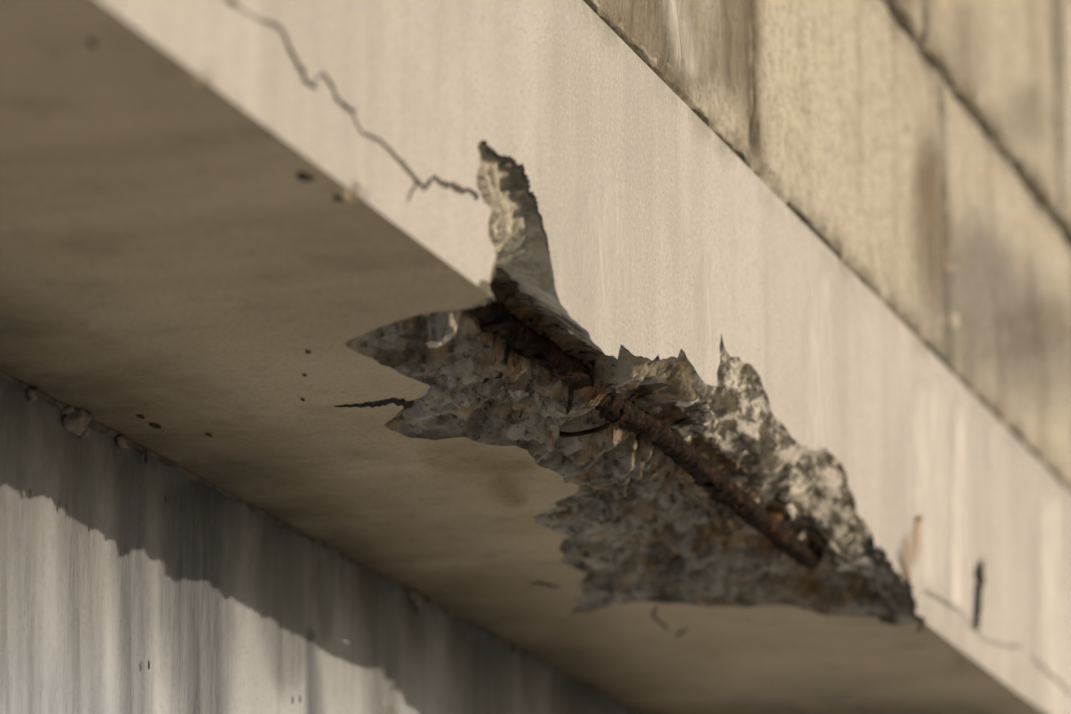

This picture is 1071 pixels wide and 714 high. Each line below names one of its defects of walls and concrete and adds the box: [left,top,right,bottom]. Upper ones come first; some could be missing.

crack [227,0,479,201]
crack [334,398,414,409]
spalling [344,141,915,626]
damp [166,488,224,714]